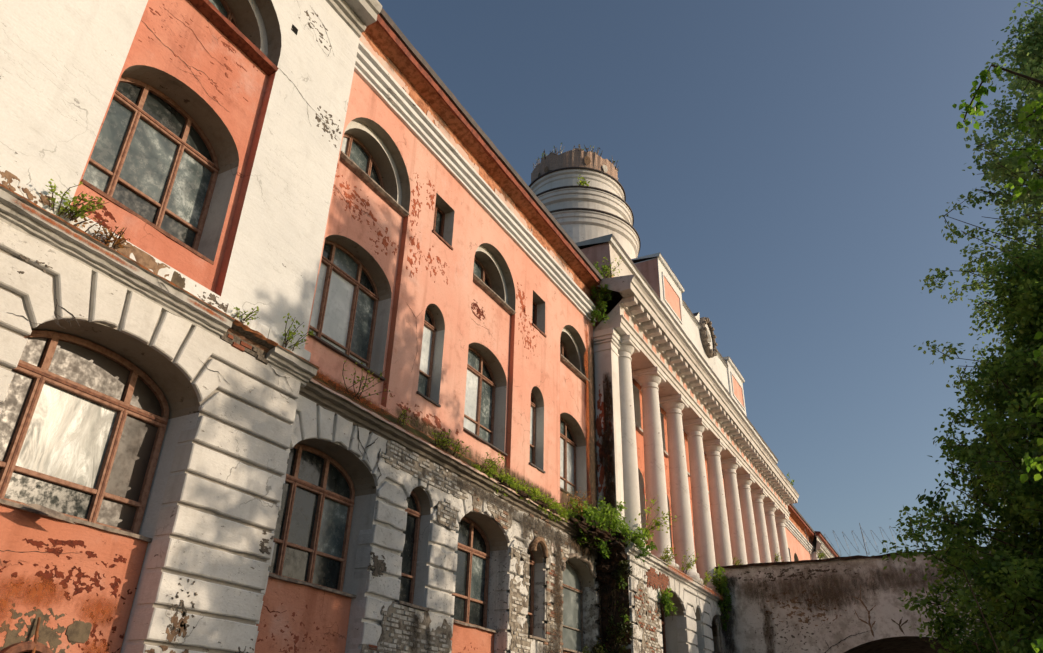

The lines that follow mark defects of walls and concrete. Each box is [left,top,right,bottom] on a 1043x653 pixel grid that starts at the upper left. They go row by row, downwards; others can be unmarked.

peeling [315,106,448,285]
flaking render [78,198,228,312]
peeling [516,282,536,359]
leakage [397,342,616,513]
peeling [0,538,137,653]
flaking render [145,578,198,653]
peeling [235,603,335,653]
flaking render [368,551,387,577]
flaking render [361,601,478,653]
flaking render [381,440,569,653]
flaking render [634,567,670,653]
leakage [715,566,950,653]